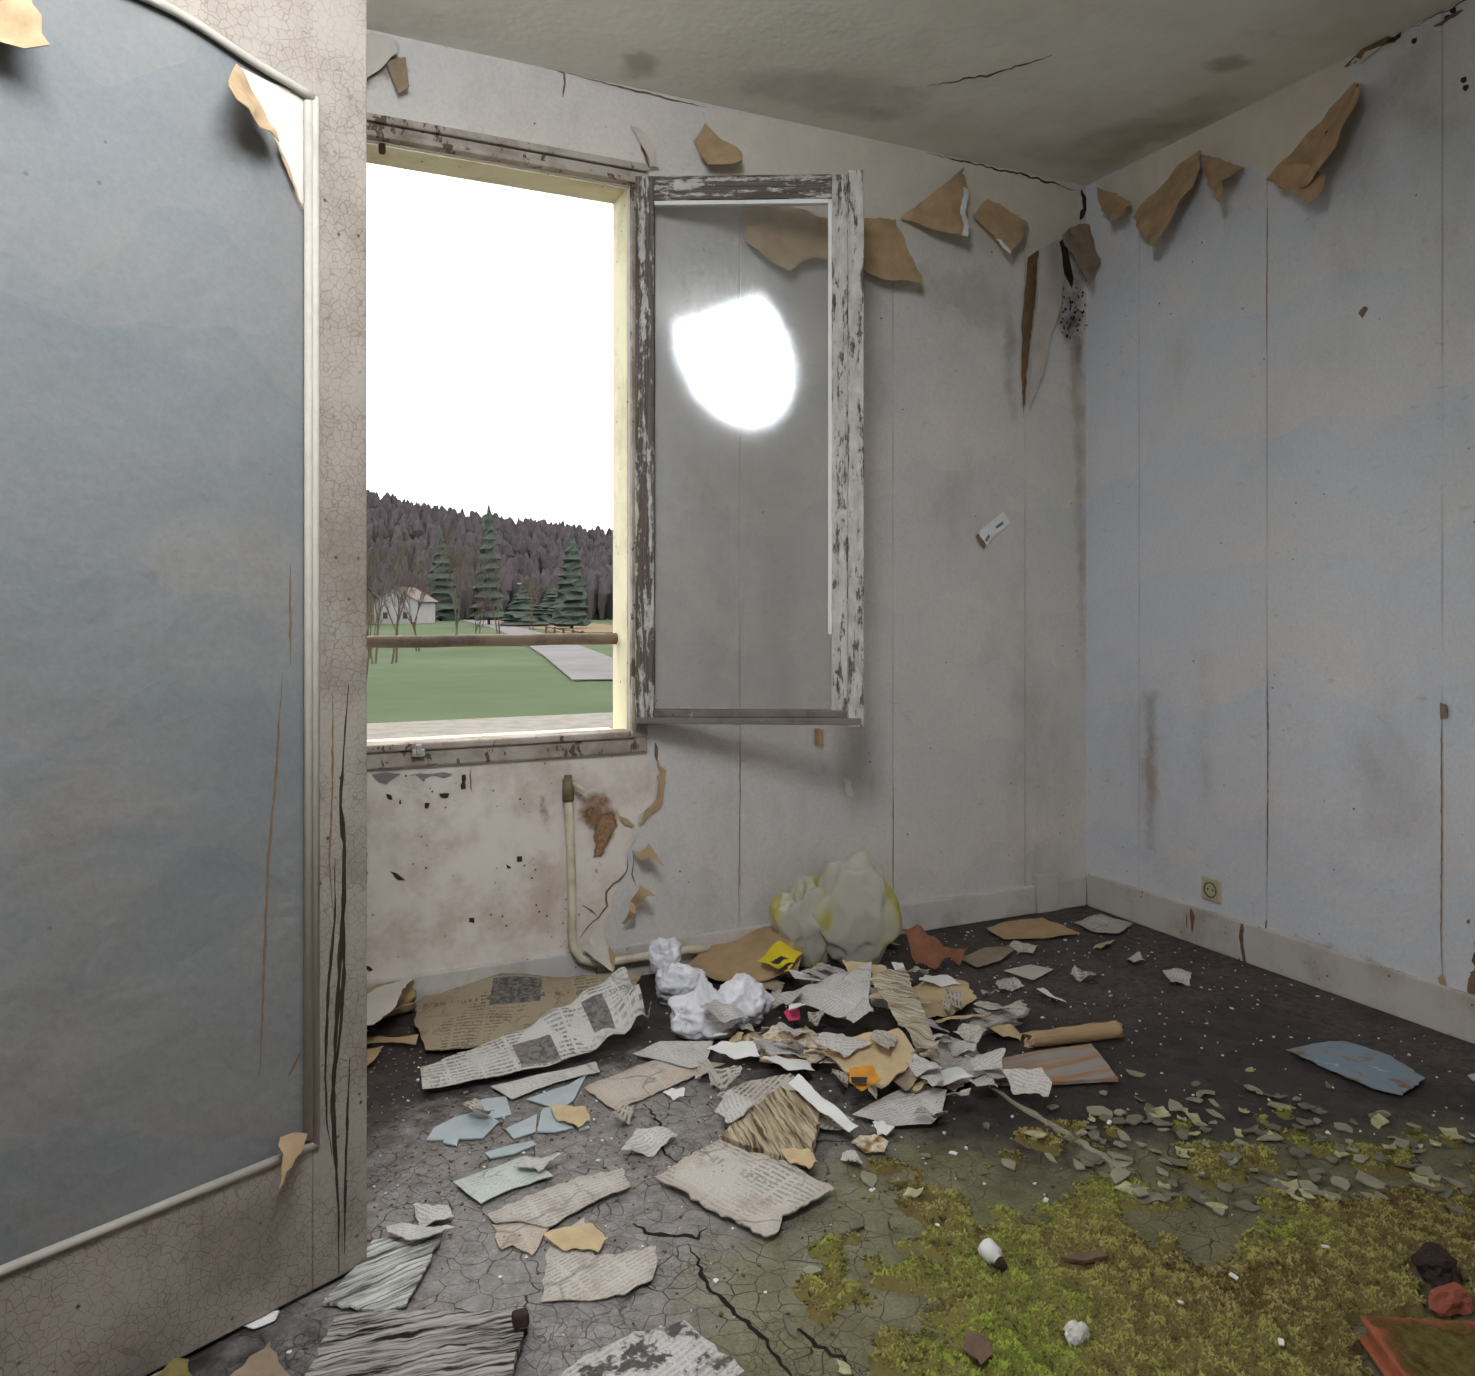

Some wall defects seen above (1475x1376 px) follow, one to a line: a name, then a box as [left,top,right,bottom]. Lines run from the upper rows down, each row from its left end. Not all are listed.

peeling [240,67,306,209]
crack [927,55,1052,87]
flaking render [710,32,1401,253]
damp [1060,287,1088,339]
crack [259,565,350,1273]
spalling [1467,942,1475,995]